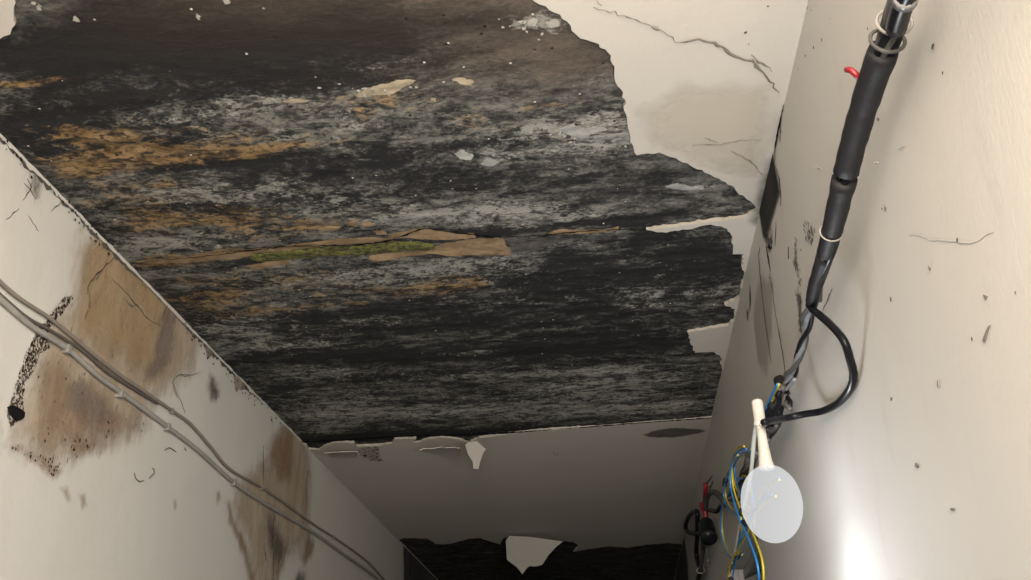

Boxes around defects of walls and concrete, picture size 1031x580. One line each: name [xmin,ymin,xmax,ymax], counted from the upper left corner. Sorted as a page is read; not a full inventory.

crack [593,1,779,93]
peeling [0,0,780,461]
crack [909,232,994,244]
damp [7,239,197,476]
damp [218,427,313,580]
peeling [400,537,682,580]